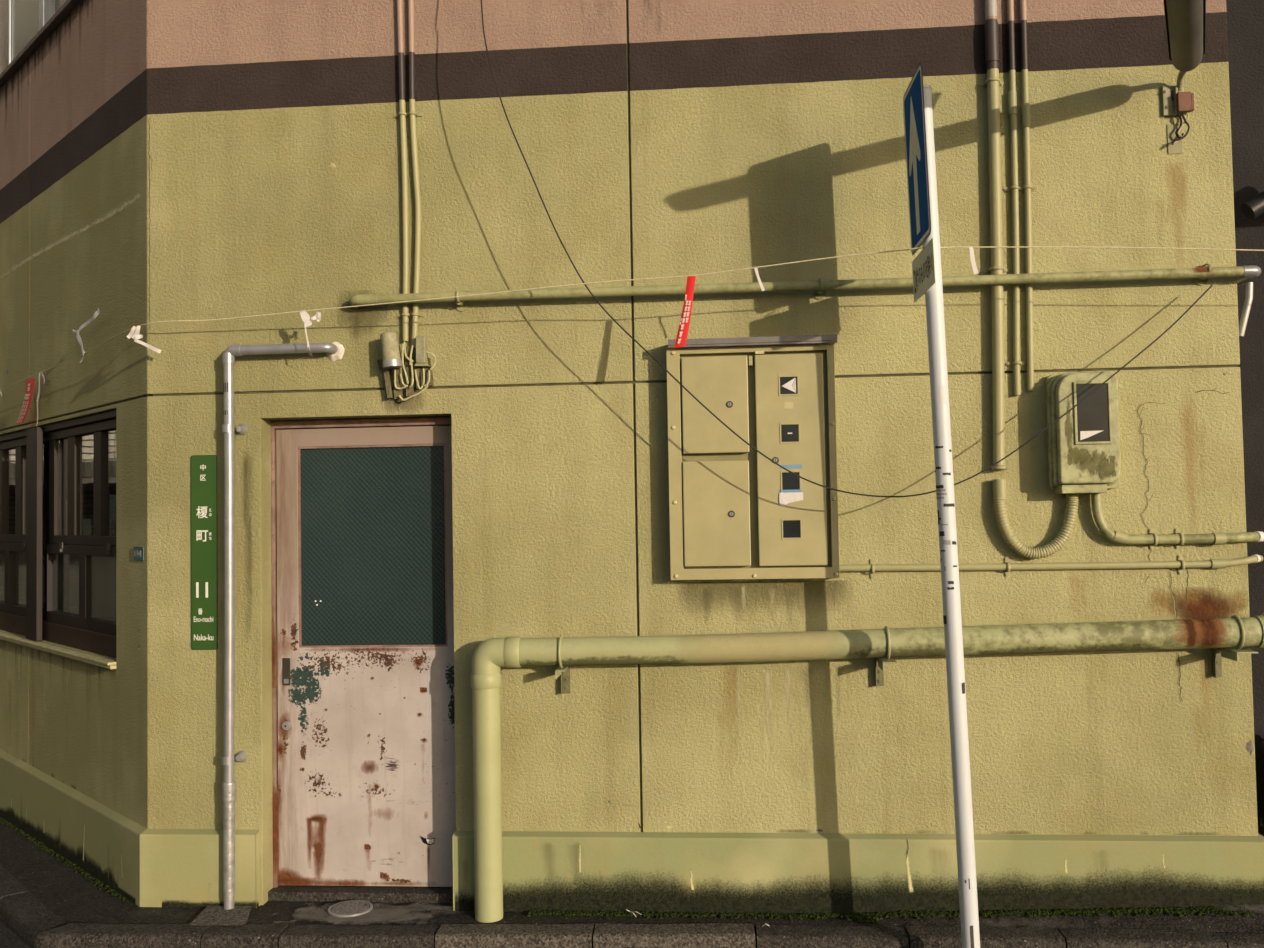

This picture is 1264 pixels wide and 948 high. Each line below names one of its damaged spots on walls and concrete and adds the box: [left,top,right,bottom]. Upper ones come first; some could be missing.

crack [1136,402,1189,620]
rust [1171,592,1234,647]
crack [1175,653,1183,702]
water stain [0,808,135,904]
water stain [455,893,474,911]
water stain [503,877,960,914]
water stain [977,873,1264,912]